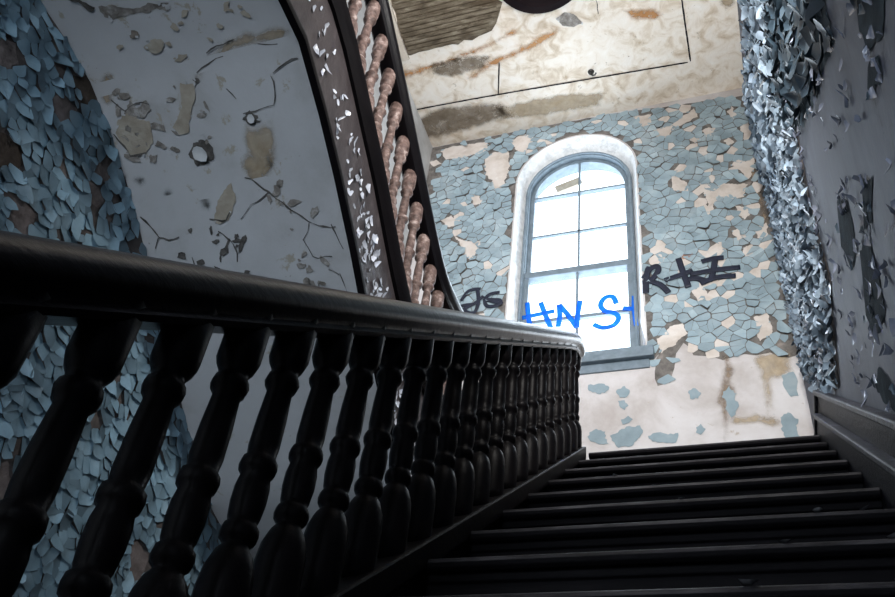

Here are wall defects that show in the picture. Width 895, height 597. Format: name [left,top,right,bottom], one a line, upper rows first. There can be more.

peeling [0,0,214,256]
crack [140,217,179,249]
crack [196,39,234,73]
crack [226,43,298,114]
crack [209,177,347,291]
peeling [313,22,336,76]
peeling [333,89,389,298]
spalling [391,0,502,55]
peeling [426,0,895,412]
peeling [0,325,77,500]
peeling [13,330,160,597]
peeling [110,404,193,597]